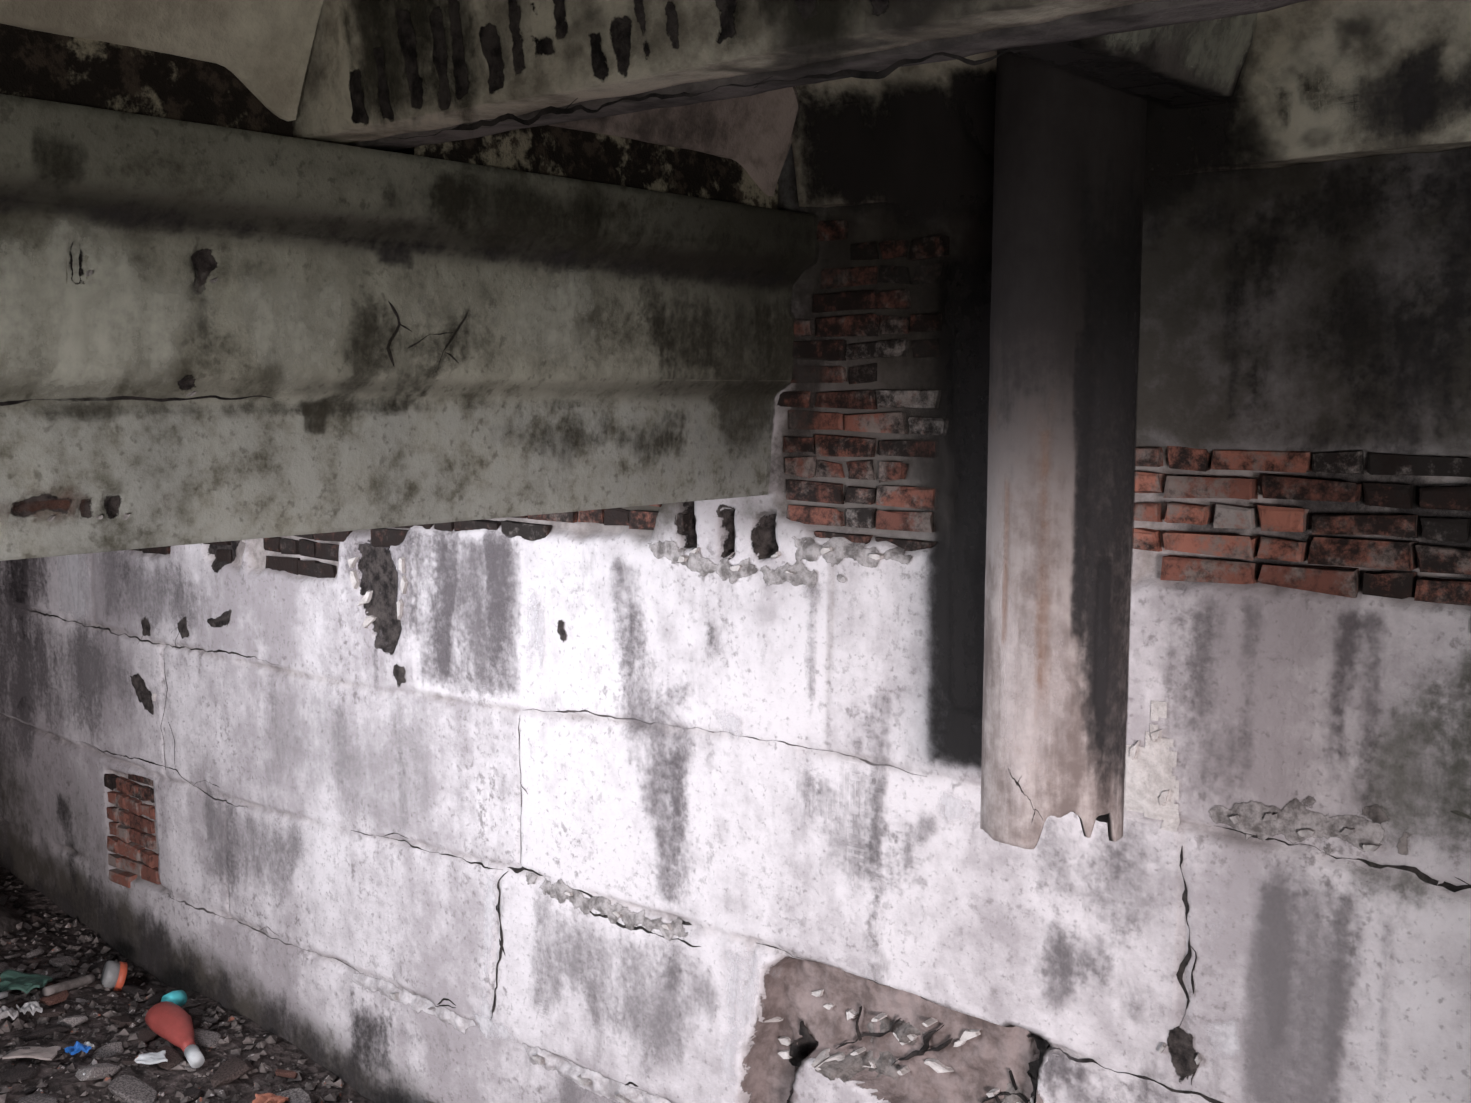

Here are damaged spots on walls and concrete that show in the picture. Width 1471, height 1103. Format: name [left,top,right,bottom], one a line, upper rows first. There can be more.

leakage [0,222,205,419]
leakage [275,396,360,433]
peeling [348,540,409,687]
leakage [434,536,453,672]
leakage [485,533,511,657]
peeling [557,620,566,642]
spalling [648,501,912,588]
crack [351,709,921,1021]
crack [1217,826,1471,893]
crack [1176,846,1197,1028]
spalling [740,957,1040,1103]
crack [1050,1047,1223,1103]